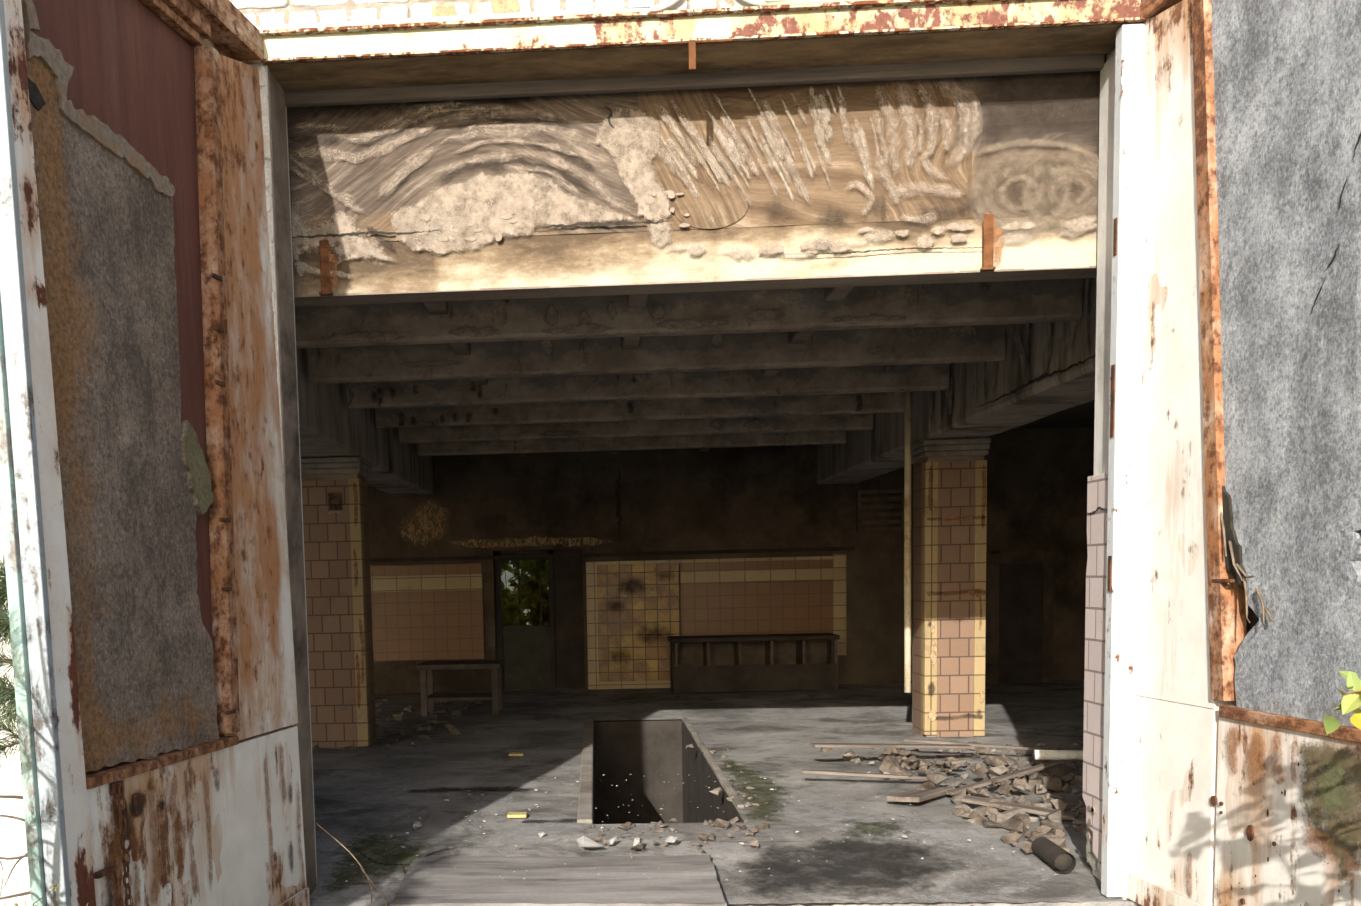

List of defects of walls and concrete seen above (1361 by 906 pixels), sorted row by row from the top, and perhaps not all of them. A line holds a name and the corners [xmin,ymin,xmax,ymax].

spalling [391,108,705,254]
crack [1338,133,1361,211]
peeling [725,222,974,258]
peeling [1002,221,1036,243]
peeling [1062,216,1097,236]
crack [1310,245,1339,315]
rust [1227,728,1298,784]
rust [112,771,213,906]
rust [264,747,304,873]